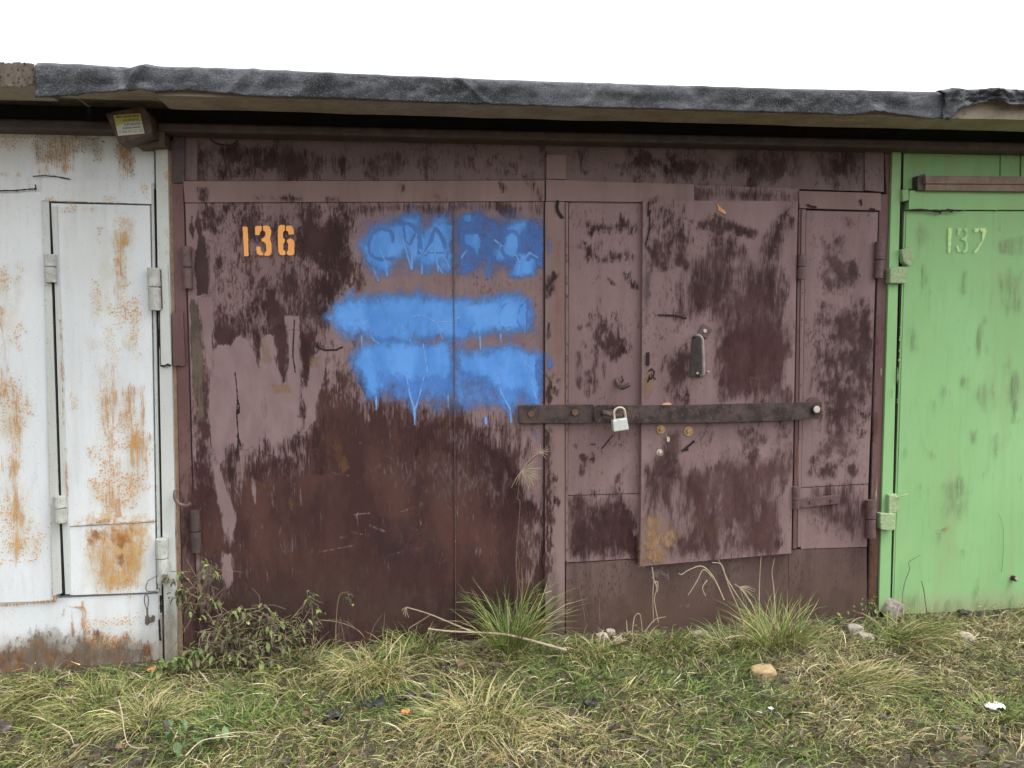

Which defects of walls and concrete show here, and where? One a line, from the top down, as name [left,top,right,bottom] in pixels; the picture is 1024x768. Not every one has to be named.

corrosion [1,134,148,200]
corrosion [84,217,153,597]
corrosion [0,358,49,565]
corrosion [640,514,677,566]
corrosion [0,589,153,673]